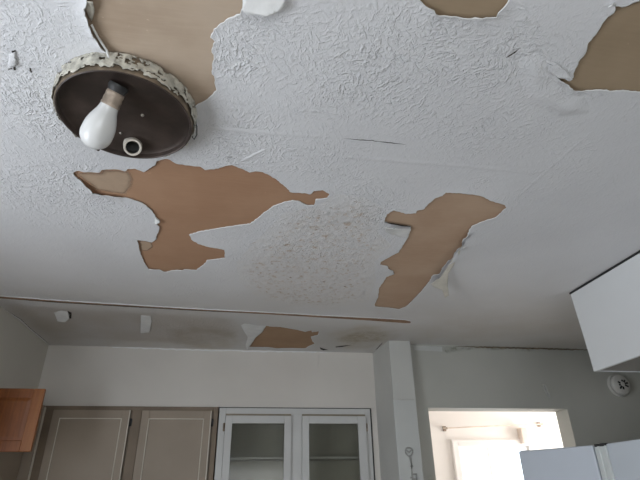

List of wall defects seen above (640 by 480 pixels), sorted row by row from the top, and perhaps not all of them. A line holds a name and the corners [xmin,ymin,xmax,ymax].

peeling [82,0,285,107]
peeling [419,0,510,20]
peeling [546,0,640,93]
peeling [73,158,330,273]
peeling [374,192,507,310]
peeling [241,323,320,349]